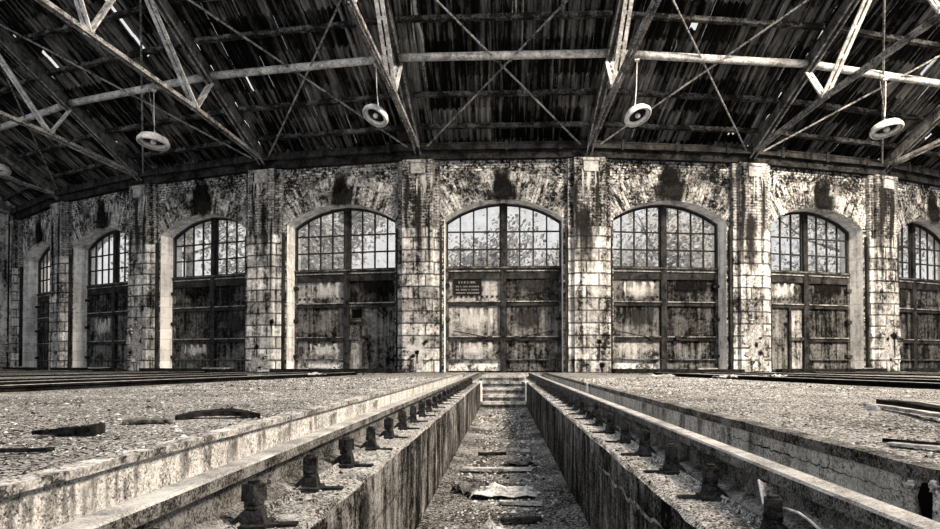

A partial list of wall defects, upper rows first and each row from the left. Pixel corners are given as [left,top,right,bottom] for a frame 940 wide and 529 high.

damp [194,179,210,212]
damp [332,170,350,205]
damp [493,164,511,199]
damp [660,164,682,198]
damp [814,178,849,209]
hole [905,479,940,522]